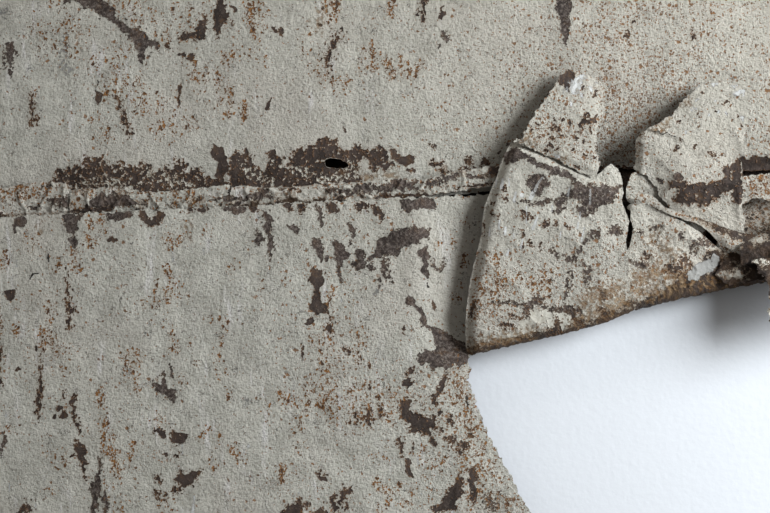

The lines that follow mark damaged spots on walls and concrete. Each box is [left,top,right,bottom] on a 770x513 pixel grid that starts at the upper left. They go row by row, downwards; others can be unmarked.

peeling [529,112,597,162]
rust [0,0,622,423]
peeling [687,253,720,281]
rust [260,223,736,513]
peeling [497,308,573,339]
rust [14,498,36,513]
rust [42,386,137,513]
rust [152,424,248,513]